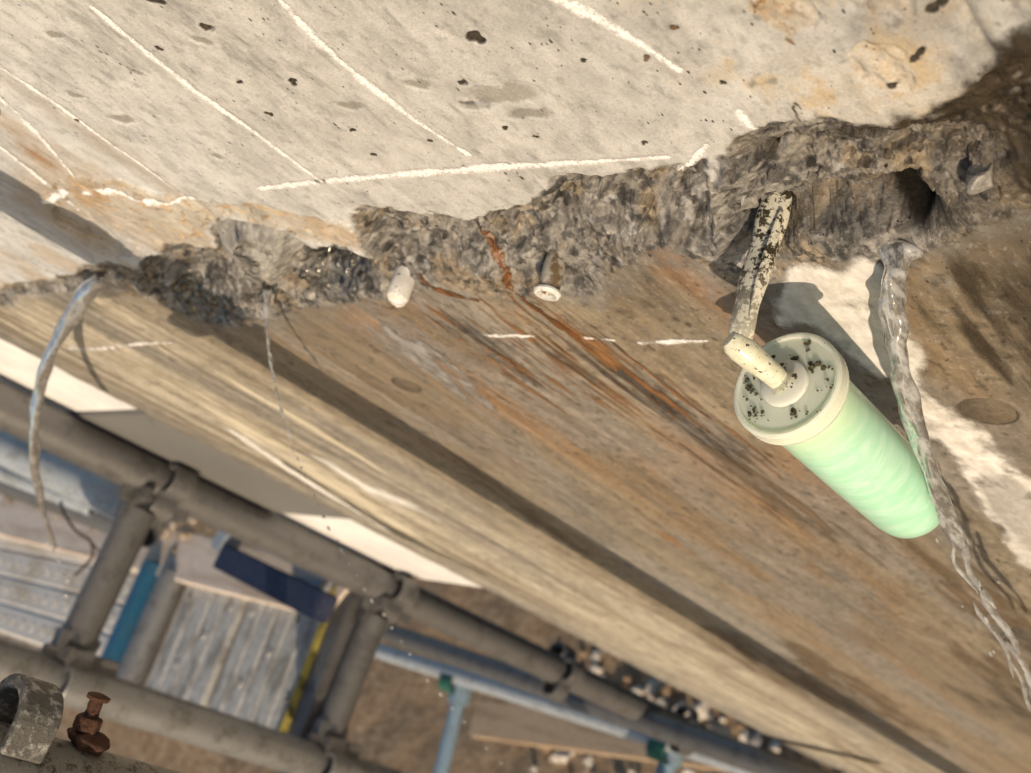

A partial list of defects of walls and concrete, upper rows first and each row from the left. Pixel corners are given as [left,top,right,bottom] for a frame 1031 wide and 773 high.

peeling [847,40,926,91]
spalling [40,62,1031,328]
rust [418,222,782,479]
damp [773,258,890,378]
damp [951,263,1012,337]
damp [958,315,1025,384]
damp [907,339,1031,570]
damp [910,542,1031,646]